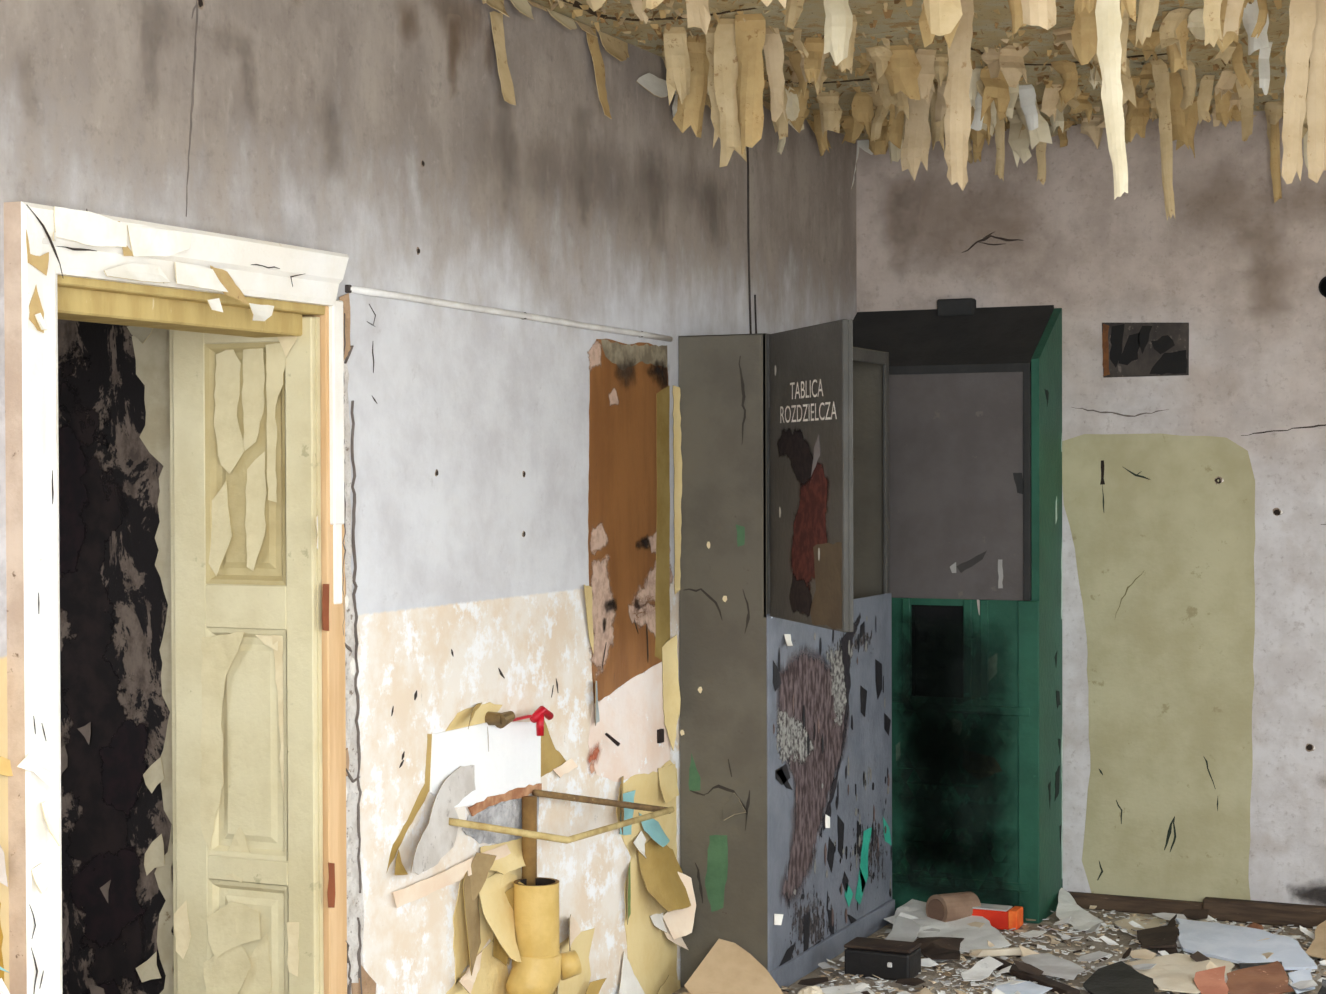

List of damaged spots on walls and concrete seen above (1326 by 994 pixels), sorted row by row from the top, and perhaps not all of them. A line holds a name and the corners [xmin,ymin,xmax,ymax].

peeling [482,0,1326,220]
peeling [26,206,274,333]
peeling [672,385,682,594]
flaking render [339,293,376,994]
peeling [584,585,594,654]
peeling [0,845,8,887]
peeling [0,752,60,846]
peeling [386,635,696,994]
peeling [0,903,10,994]